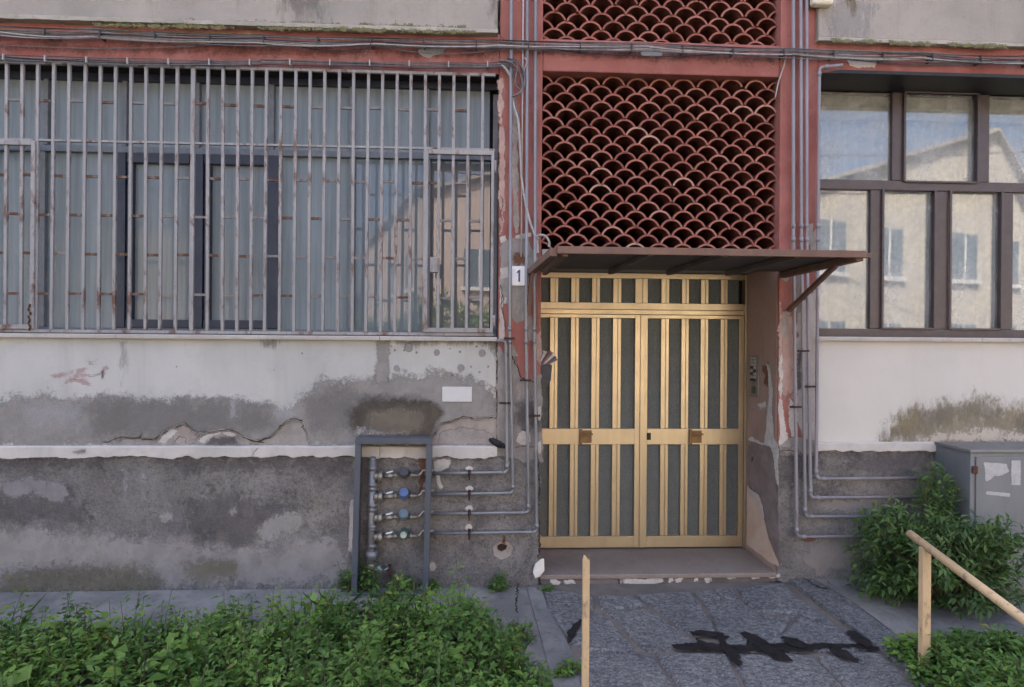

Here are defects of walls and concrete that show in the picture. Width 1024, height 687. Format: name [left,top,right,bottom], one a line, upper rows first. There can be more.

peeling [100,418,309,446]
damp [0,340,497,590]
peeling [432,77,544,560]
peeling [746,272,821,579]
damp [845,397,1024,476]